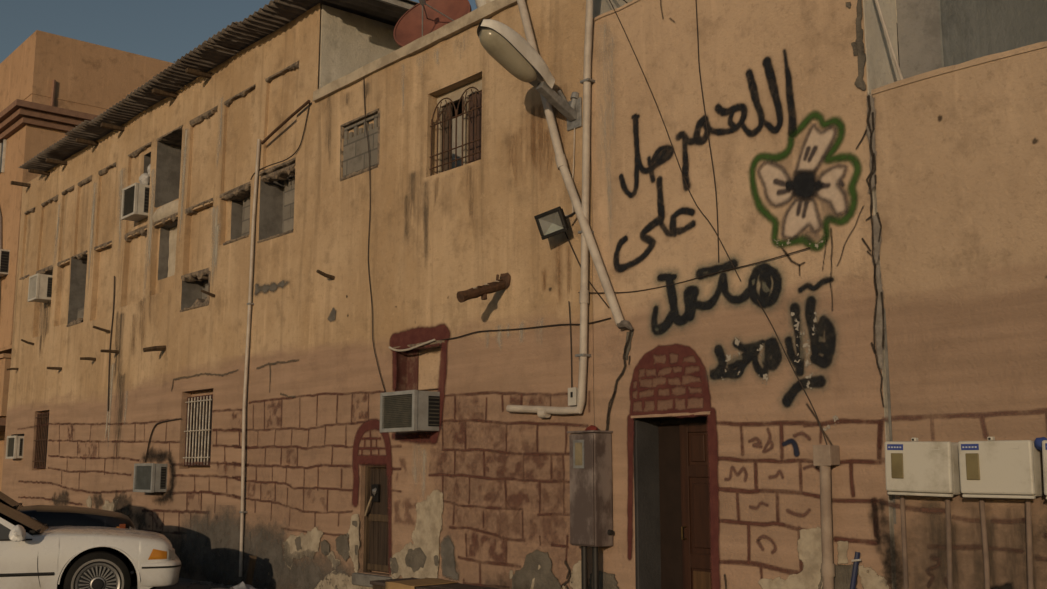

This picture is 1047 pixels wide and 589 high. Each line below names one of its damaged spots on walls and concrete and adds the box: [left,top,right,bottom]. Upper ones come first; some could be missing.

peeling [283,514,373,589]
peeling [390,489,443,579]
spalling [509,550,619,589]
peeling [758,527,889,589]